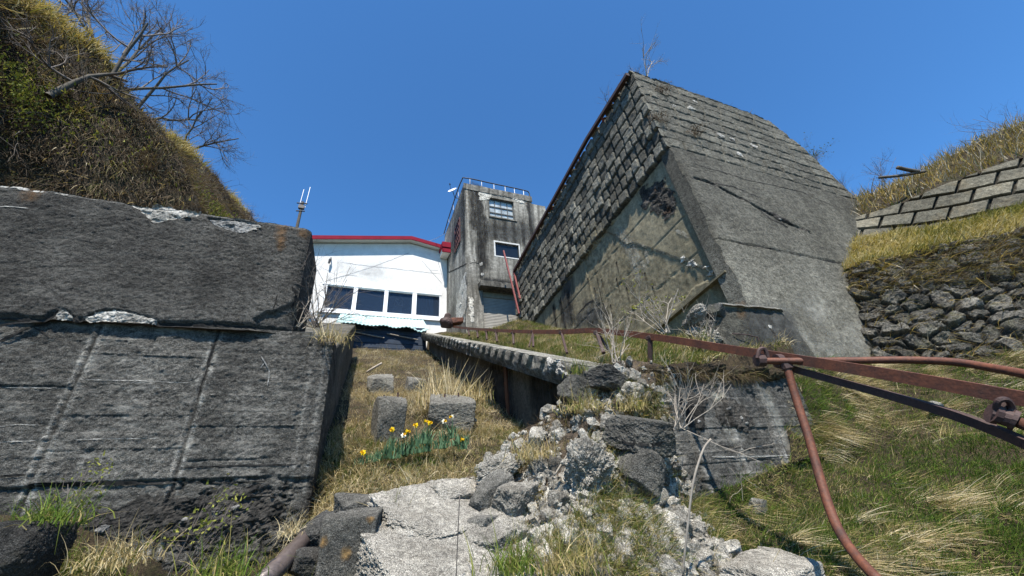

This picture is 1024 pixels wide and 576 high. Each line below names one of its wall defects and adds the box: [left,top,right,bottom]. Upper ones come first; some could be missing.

spalling [132,204,261,233]
damp [451,183,535,283]
crack [684,164,838,263]
spalling [56,308,157,325]